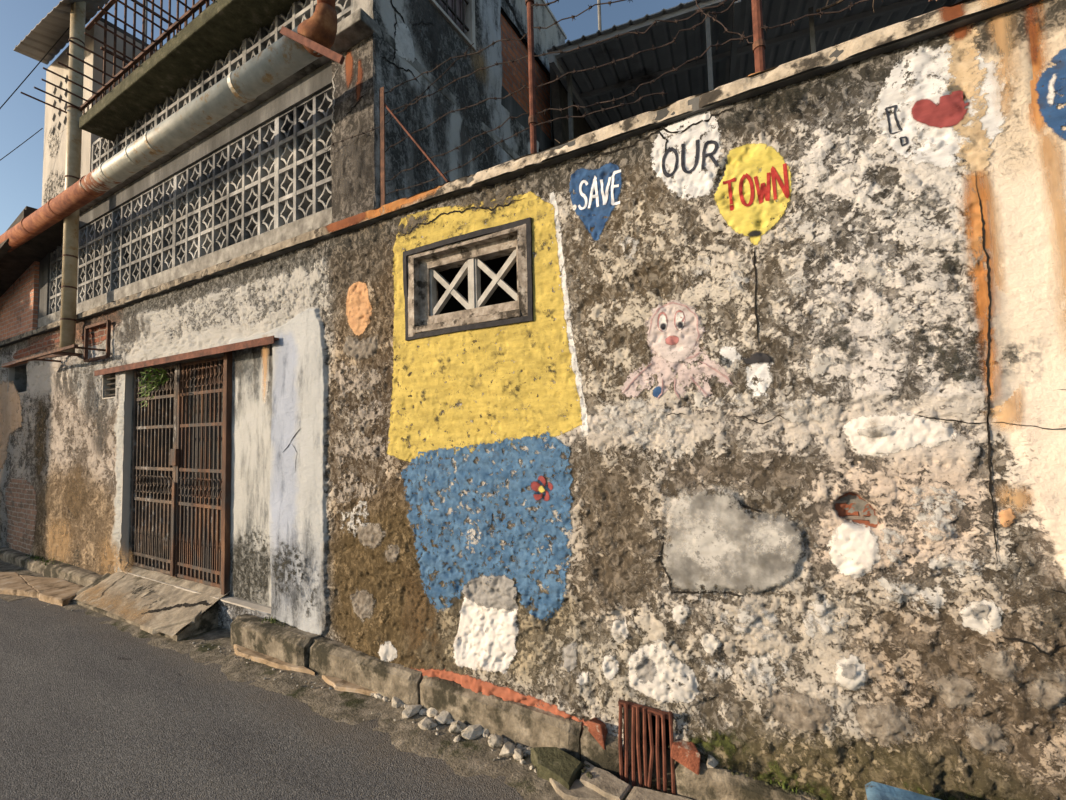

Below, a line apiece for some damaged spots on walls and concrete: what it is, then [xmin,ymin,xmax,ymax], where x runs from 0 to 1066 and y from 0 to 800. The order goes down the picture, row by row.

crack [380,0,433,85]
rust [1027,3,1066,296]
rust [941,0,1021,427]
water stain [34,404,47,484]
water stain [55,364,107,451]
crack [908,171,1066,564]
crack [141,600,210,614]
water stain [231,530,318,617]
spalling [602,483,984,703]
peeling [959,599,1004,636]
spalling [932,644,1066,713]
spalling [670,739,700,775]